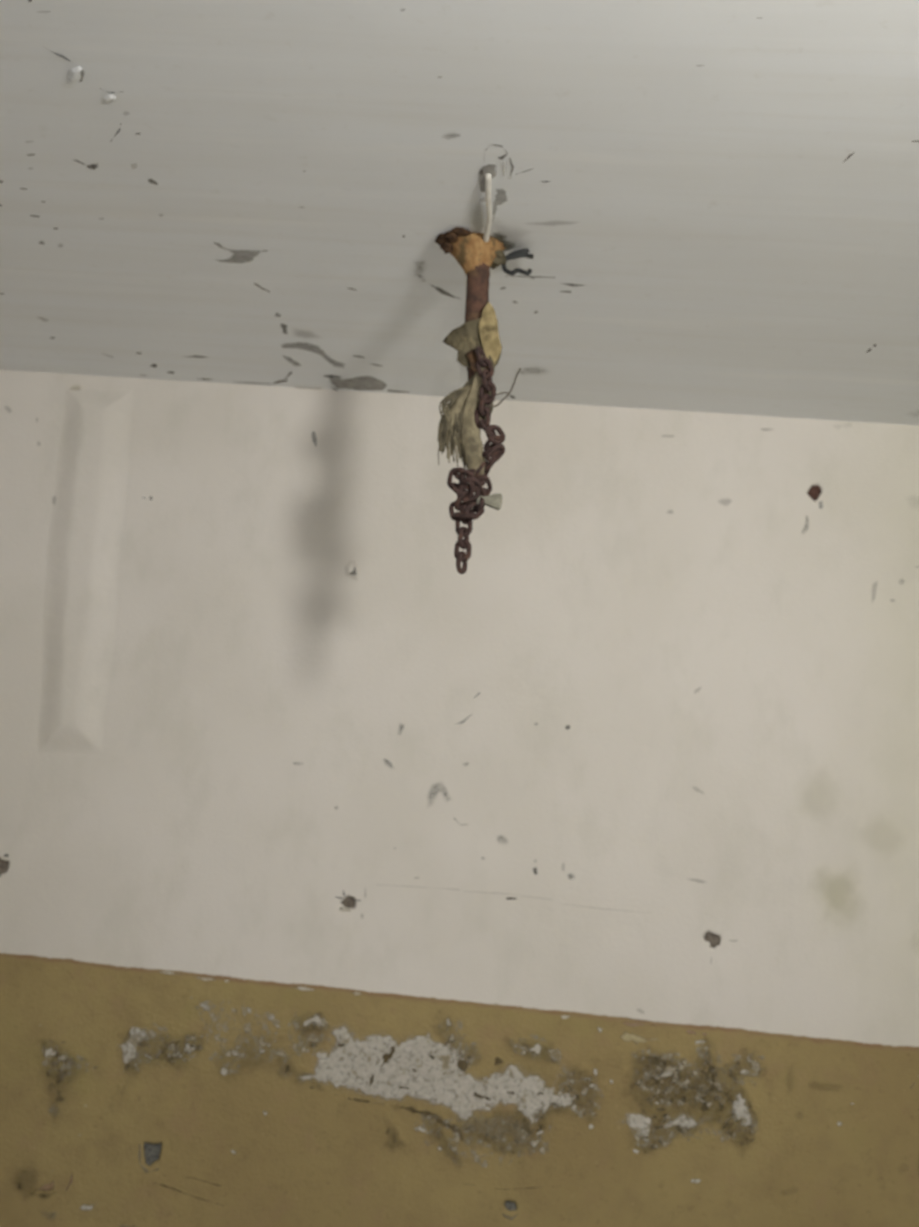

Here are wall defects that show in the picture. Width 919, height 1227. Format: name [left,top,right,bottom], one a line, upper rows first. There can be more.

spalling [121,997,613,1167]
spalling [620,1022,764,1153]